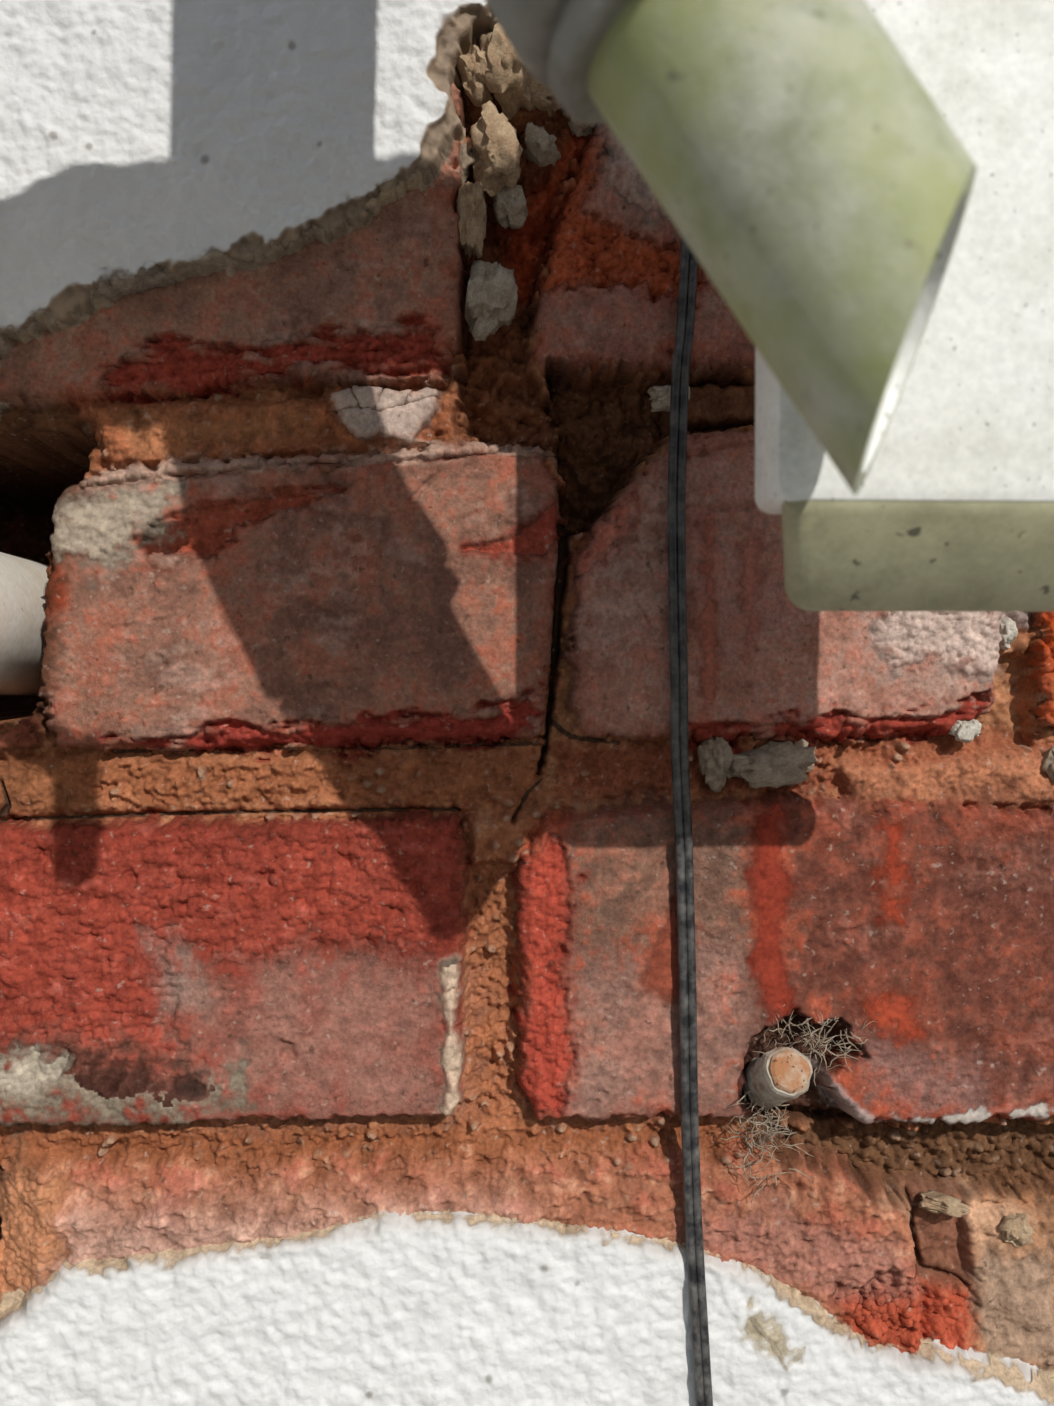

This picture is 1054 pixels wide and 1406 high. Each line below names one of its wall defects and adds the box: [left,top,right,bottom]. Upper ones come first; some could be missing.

spalling [0,401,352,566]
spalling [426,363,671,587]
spalling [687,372,755,434]
crack [111,746,293,754]
crack [346,525,620,817]
spalling [691,695,995,748]
leakage [868,611,1002,683]
spalling [0,808,472,1068]
spalling [509,835,585,1119]
leakage [0,1045,248,1126]
spalling [0,1158,341,1320]
spalling [704,1250,1054,1404]